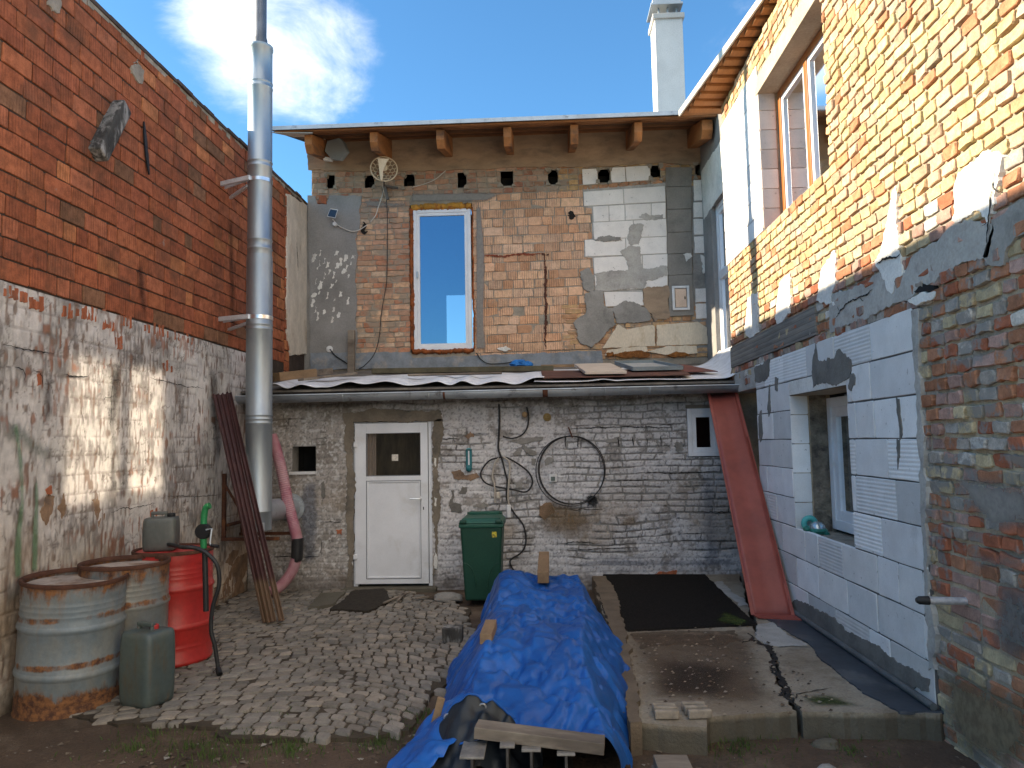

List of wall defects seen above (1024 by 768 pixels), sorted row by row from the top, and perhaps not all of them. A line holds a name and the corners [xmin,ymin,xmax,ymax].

crack [982,168,1002,253]
peeling [3,285,44,312]
peeling [61,303,193,350]
crack [484,253,549,347]
spalling [914,283,939,293]
crack [742,633,832,709]